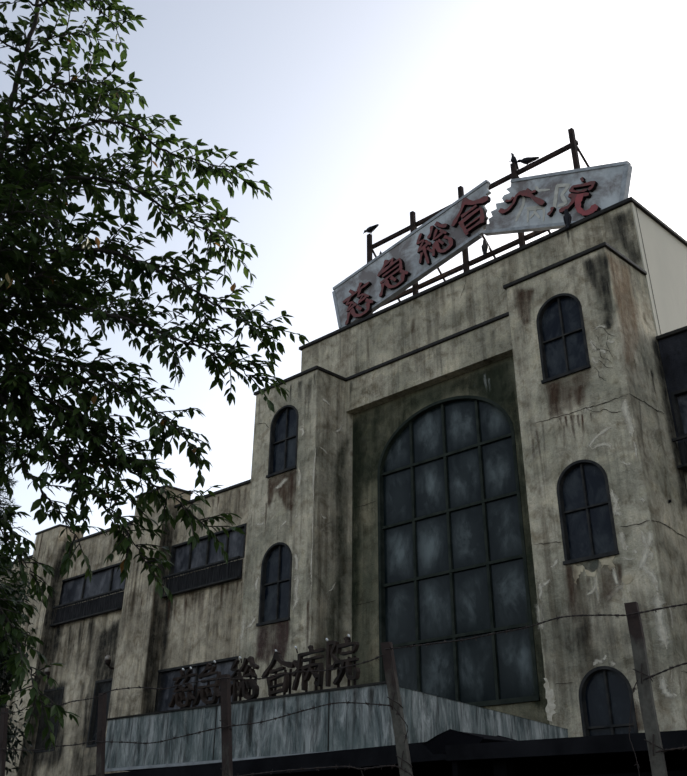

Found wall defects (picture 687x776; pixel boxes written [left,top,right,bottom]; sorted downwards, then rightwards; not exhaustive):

water stain [584,257,611,329]
crack [536,394,664,423]
rust [269,473,294,508]
flaking render [573,531,673,649]
water stain [69,623,118,683]
rust [257,620,289,661]
spalling [544,678,556,722]